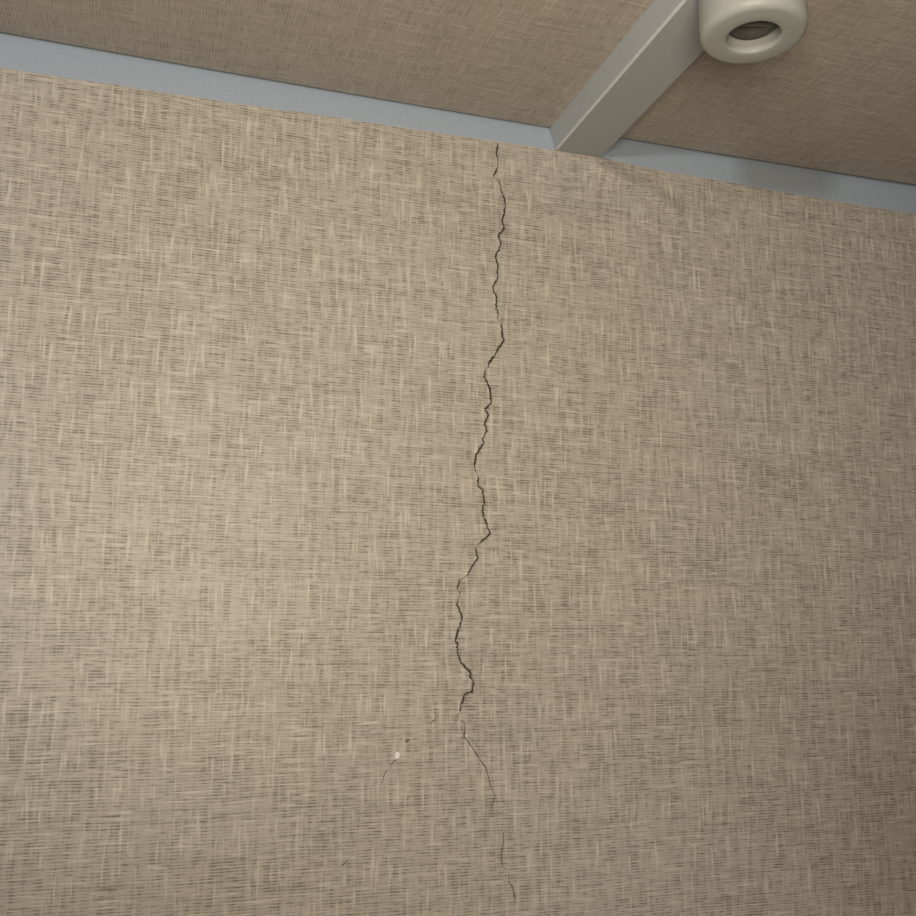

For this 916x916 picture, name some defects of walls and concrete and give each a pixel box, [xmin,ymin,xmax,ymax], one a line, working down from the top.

crack [431,143,516,914]